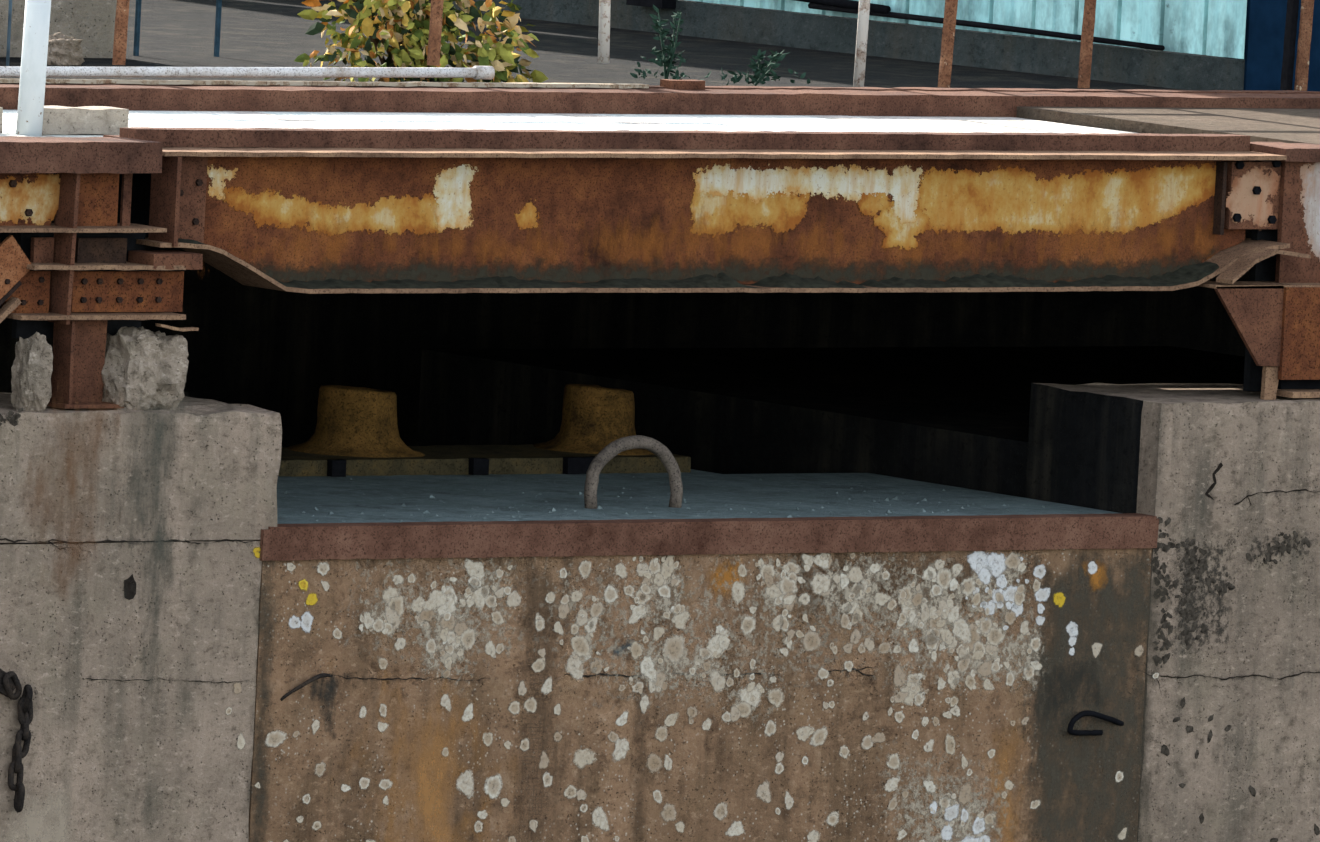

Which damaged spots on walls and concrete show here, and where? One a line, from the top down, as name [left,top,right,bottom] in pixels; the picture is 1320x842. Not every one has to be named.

peeling [207,164,479,236]
peeling [690,162,1281,251]
peeling [1300,162,1320,262]
crack [1205,463,1320,508]
crack [0,538,256,554]
rust [711,563,743,593]
crack [1137,670,1320,696]